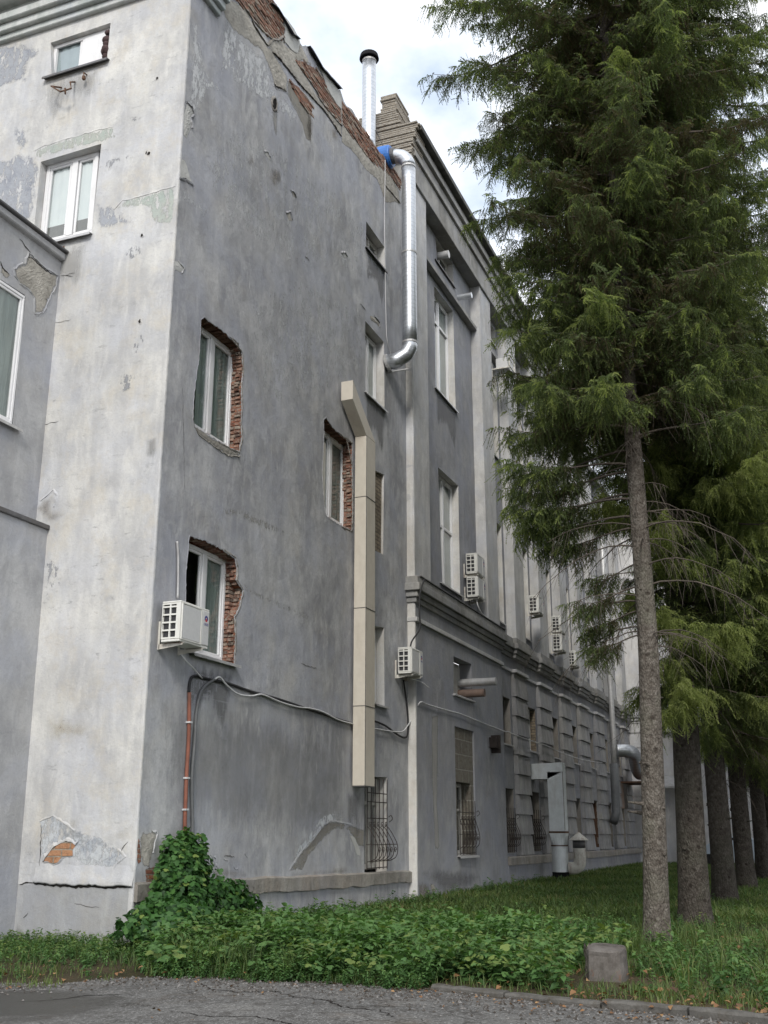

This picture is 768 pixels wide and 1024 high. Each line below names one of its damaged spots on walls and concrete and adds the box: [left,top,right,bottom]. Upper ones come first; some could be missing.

peeling [222,0,402,204]
peeling [0,126,114,218]
peeling [99,159,194,226]
peeling [0,239,59,316]
spalling [193,317,244,454]
spalling [322,417,354,532]
spalling [185,535,244,667]
crack [20,828,134,908]
peeling [39,815,158,882]